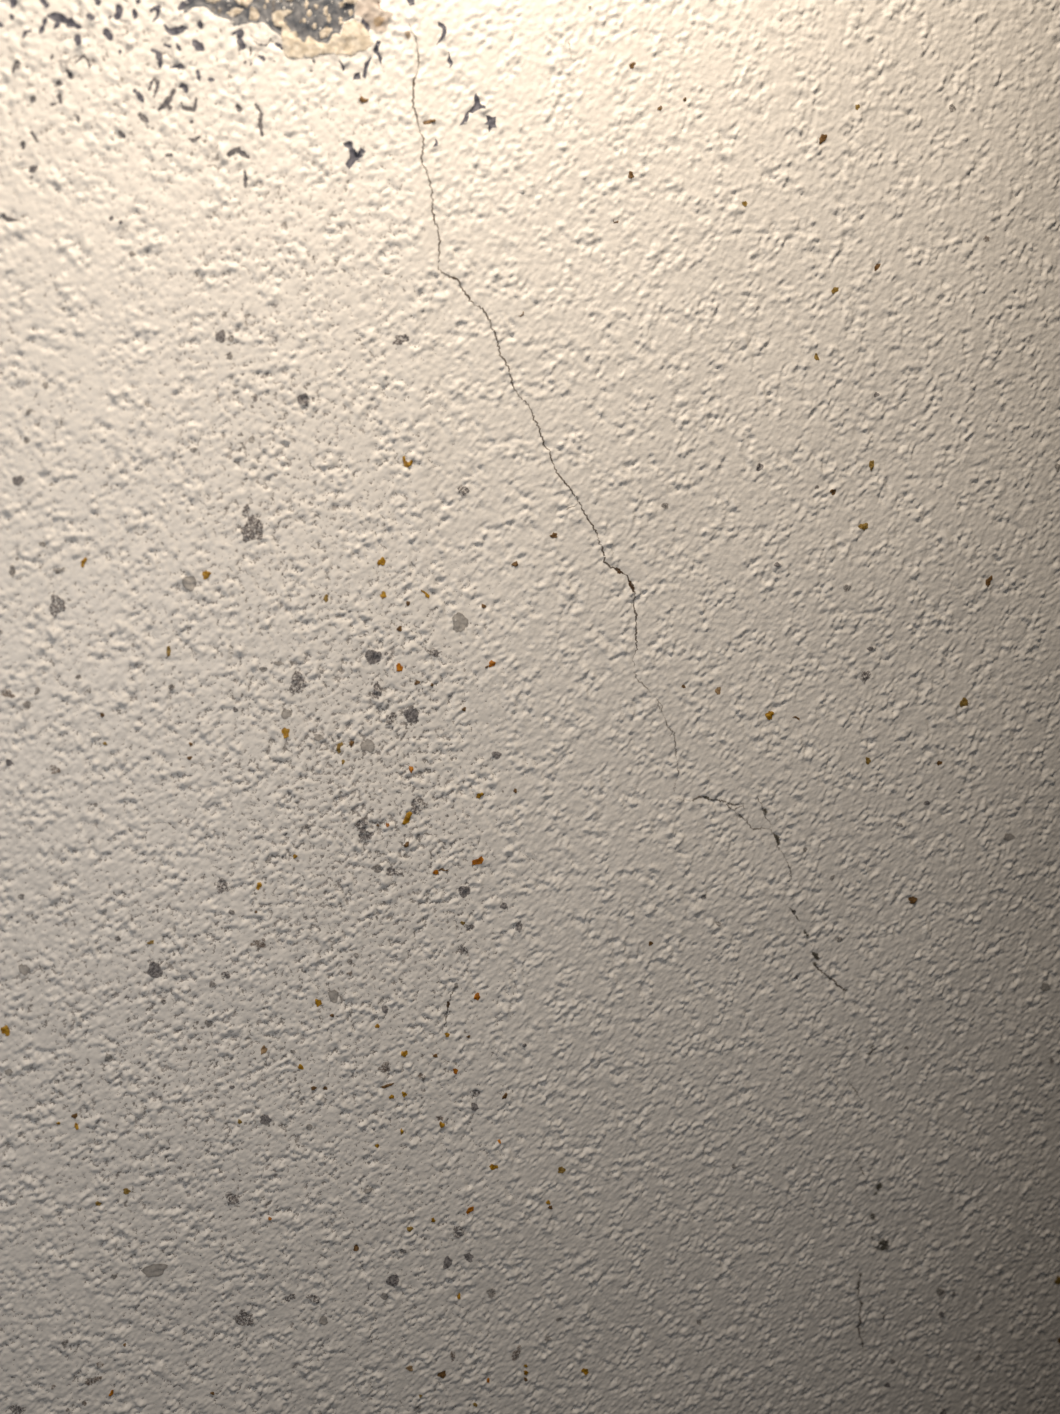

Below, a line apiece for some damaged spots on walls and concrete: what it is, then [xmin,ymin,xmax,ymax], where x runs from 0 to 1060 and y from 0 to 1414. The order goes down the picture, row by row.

peeling [0,0,392,142]
peeling [226,147,250,188]
crack [409,24,648,689]
crack [693,796,791,875]
crack [791,909,847,991]